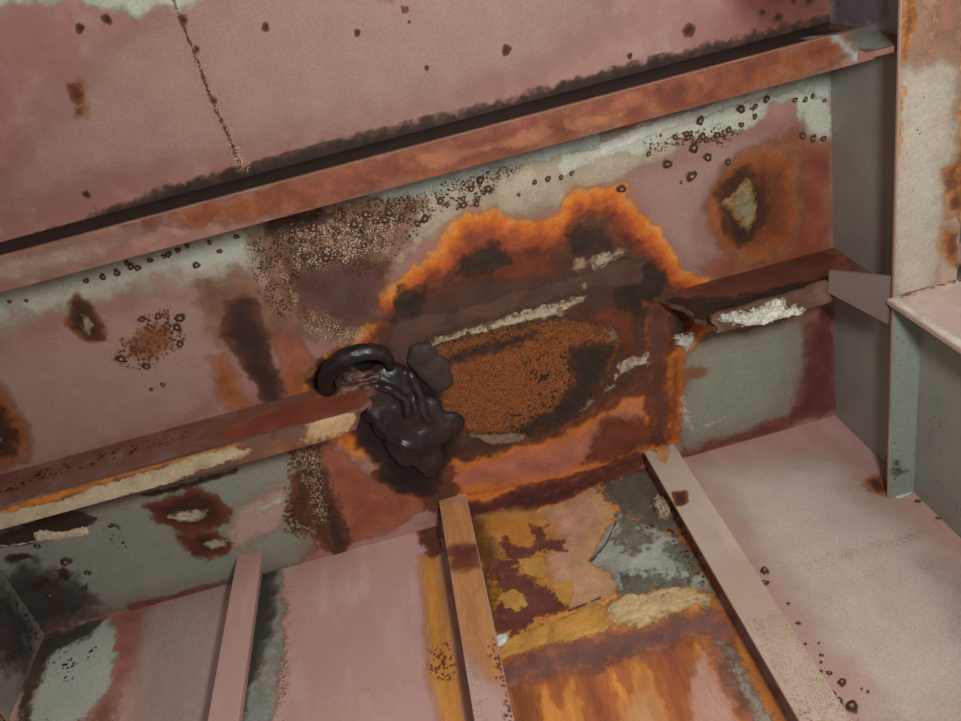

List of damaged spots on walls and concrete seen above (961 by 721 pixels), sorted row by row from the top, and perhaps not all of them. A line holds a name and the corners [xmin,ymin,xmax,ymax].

peeling [82,0,194,25]
crack [173,0,249,172]
rust [0,15,851,255]
rust [900,0,961,163]
rust [114,309,186,370]
rust [142,36,850,721]
peeling [481,470,716,660]